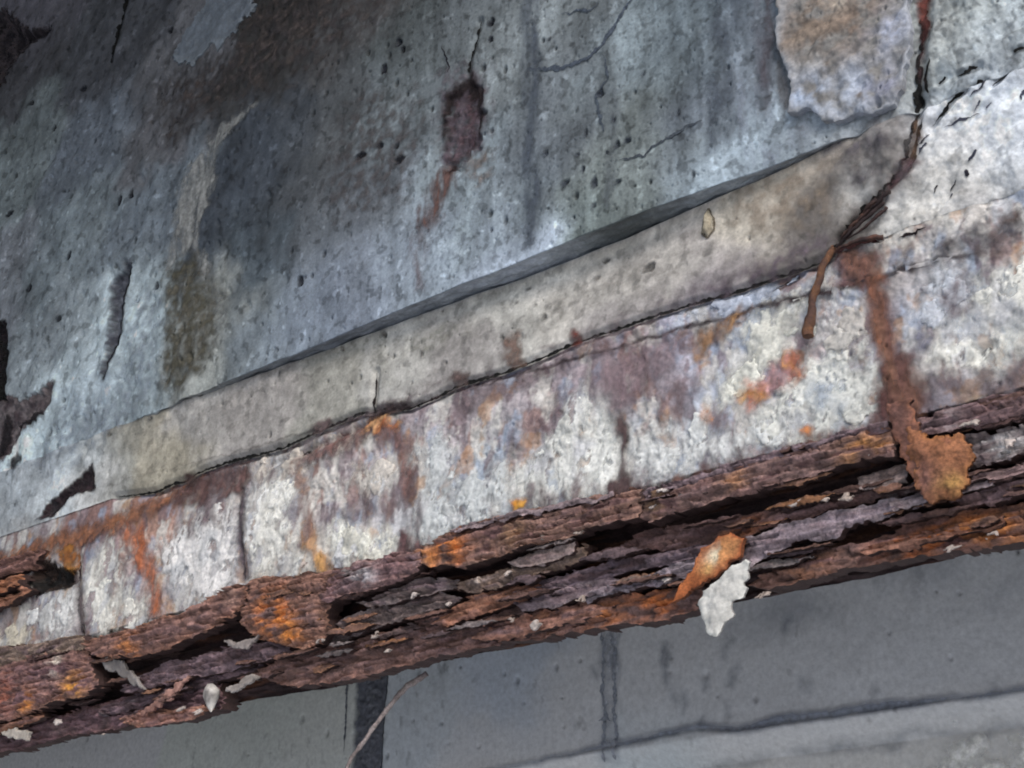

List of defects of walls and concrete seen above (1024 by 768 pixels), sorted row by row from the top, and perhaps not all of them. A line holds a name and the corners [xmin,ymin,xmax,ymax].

flaking render [775,0,914,125]
corrosion [918,0,931,42]
peeling [166,103,255,278]
corrosion [417,152,453,226]
crack [120,0,1024,497]
corrosion [882,120,919,194]
spalling [100,261,132,379]
leakage [161,255,217,389]
spalling [37,463,95,519]
corrosion [0,252,1024,758]
peeling [159,254,1024,609]
peeling [698,559,771,637]